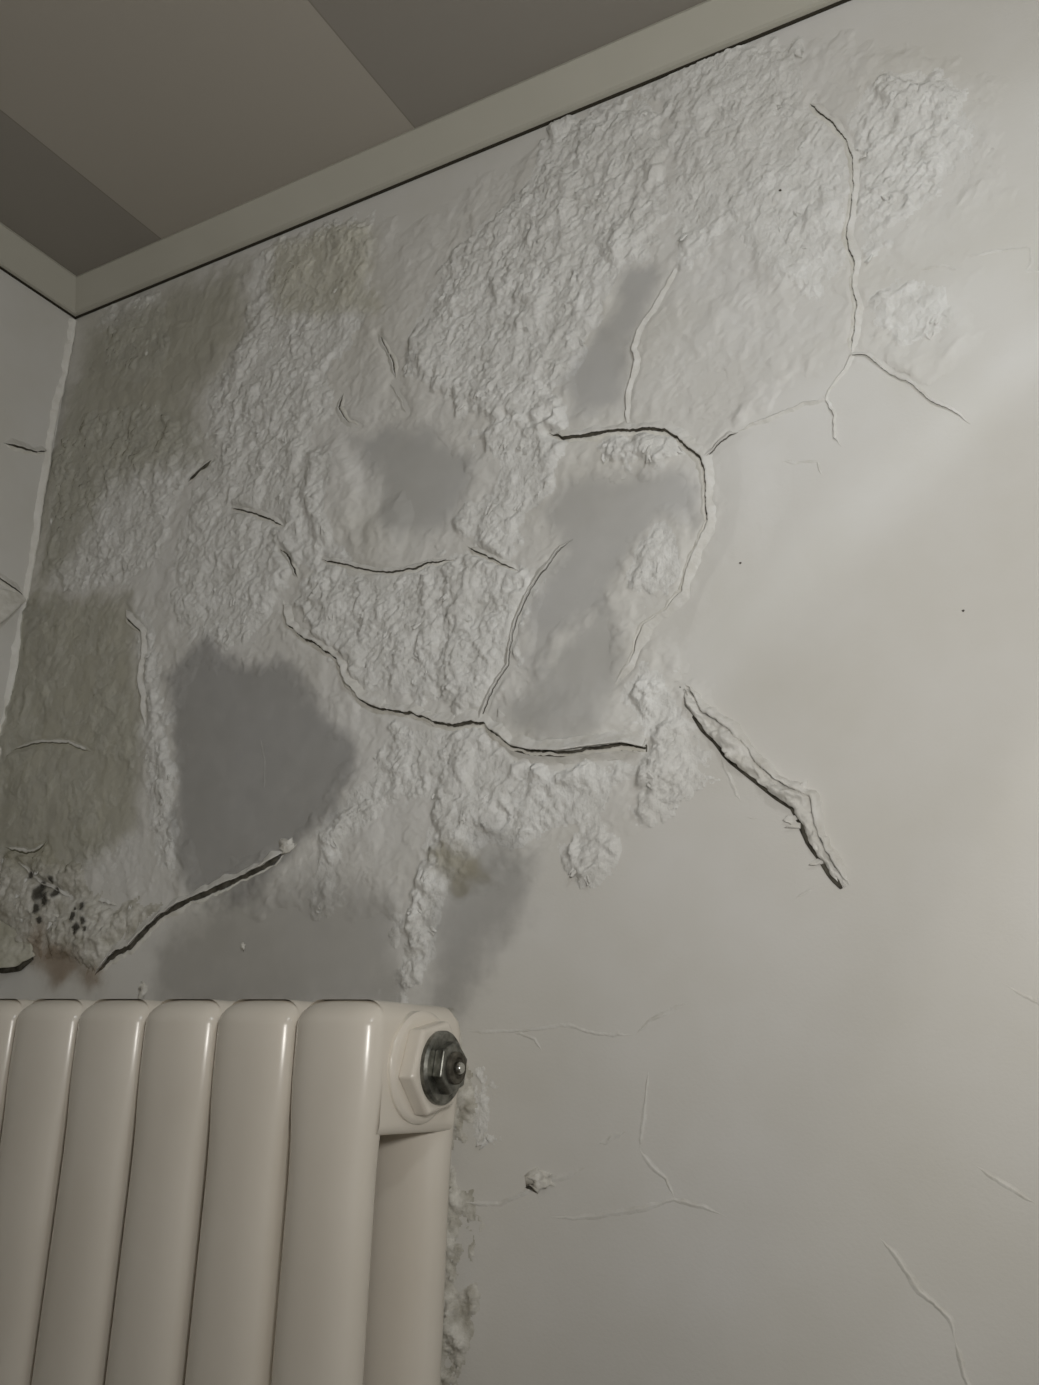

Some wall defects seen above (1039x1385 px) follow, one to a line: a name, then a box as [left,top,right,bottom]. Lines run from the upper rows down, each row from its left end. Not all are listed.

crack [0,573,23,595]
crack [3,438,47,455]
crack [335,393,359,427]
crack [378,334,407,414]
peeling [0,35,850,1003]
crack [231,507,648,766]
crack [549,98,970,684]
spalling [440,1033,485,1385]
crack [881,1240,972,1385]